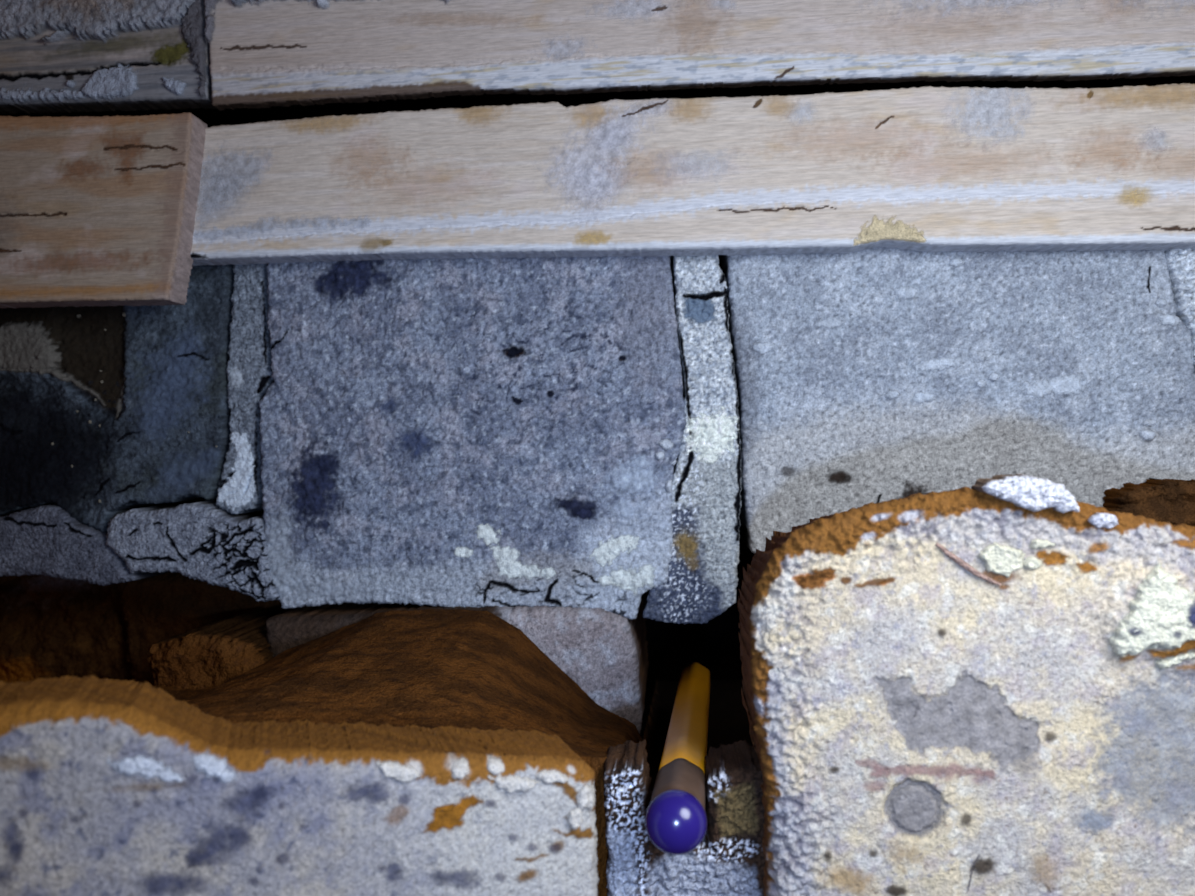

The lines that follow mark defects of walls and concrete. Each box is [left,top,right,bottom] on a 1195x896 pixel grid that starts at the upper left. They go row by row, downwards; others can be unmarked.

water stain [316,260,392,298]
water stain [231,367,244,387]
crack [675,273,742,541]
crack [95,281,289,601]
water stain [217,432,256,511]
water stain [266,443,340,592]
water stain [454,524,556,580]
crack [476,570,631,616]
water stain [590,535,655,594]